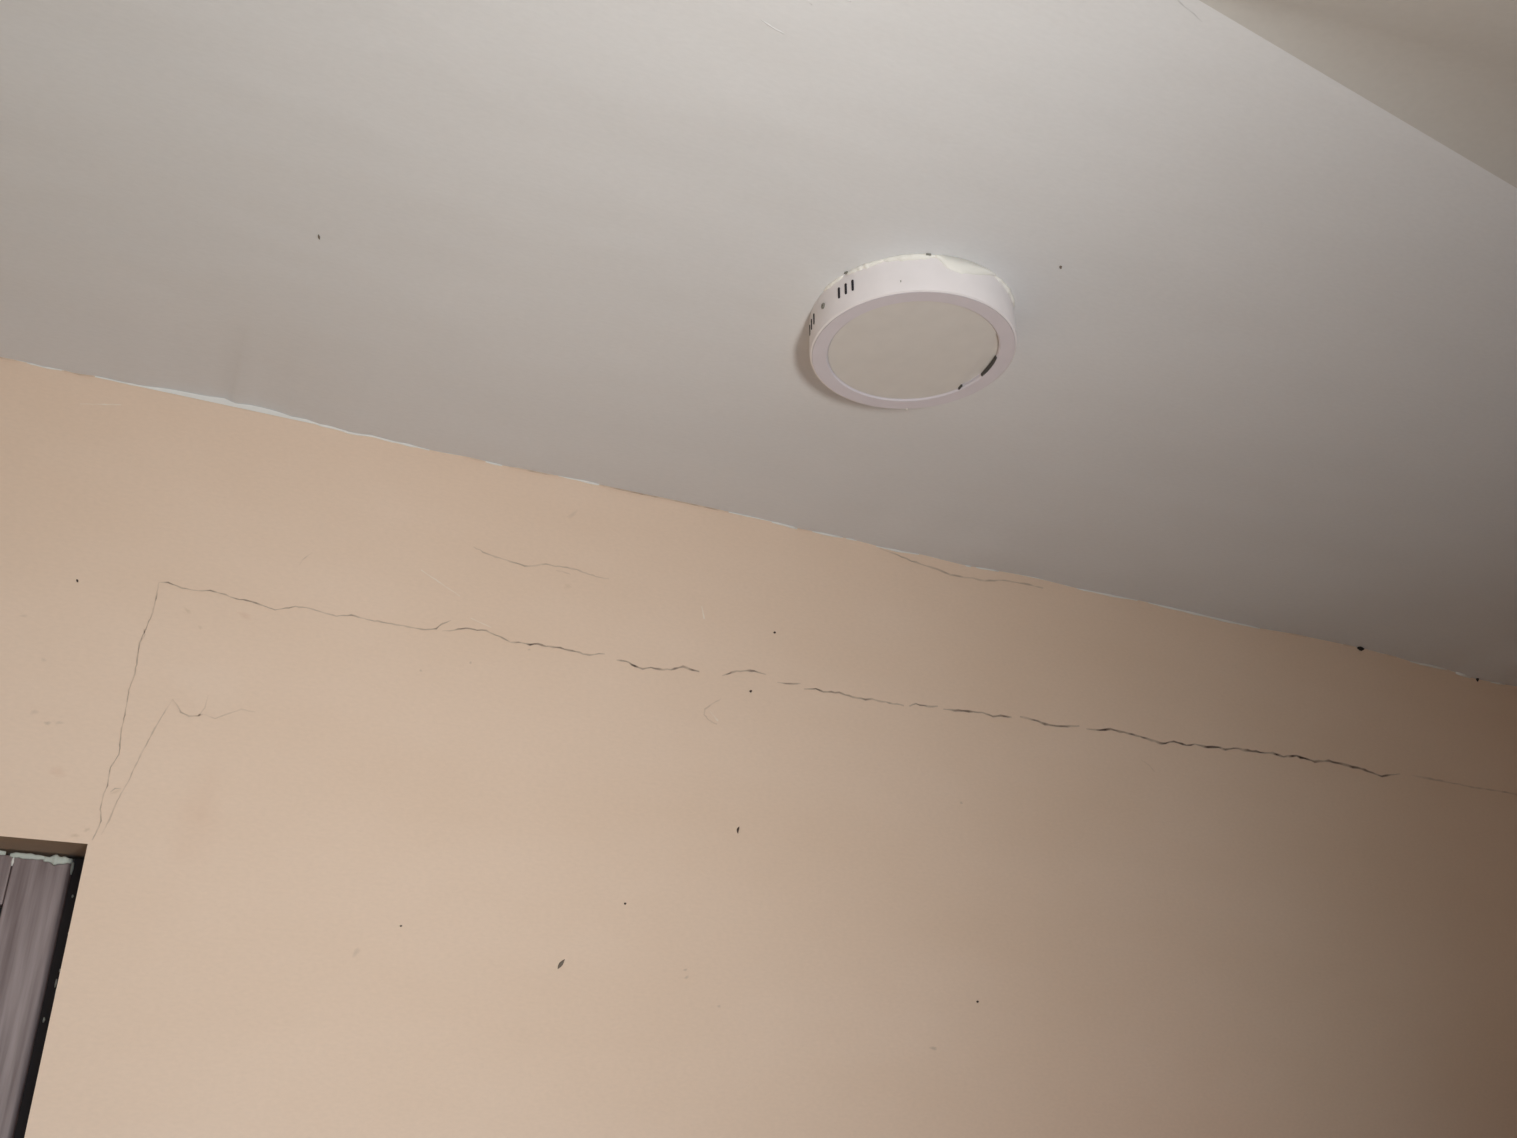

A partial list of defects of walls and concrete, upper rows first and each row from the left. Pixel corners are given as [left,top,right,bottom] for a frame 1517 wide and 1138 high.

crack [600,485,729,513]
crack [474,547,609,579]
crack [879,548,1043,589]
crack [92,581,1517,840]